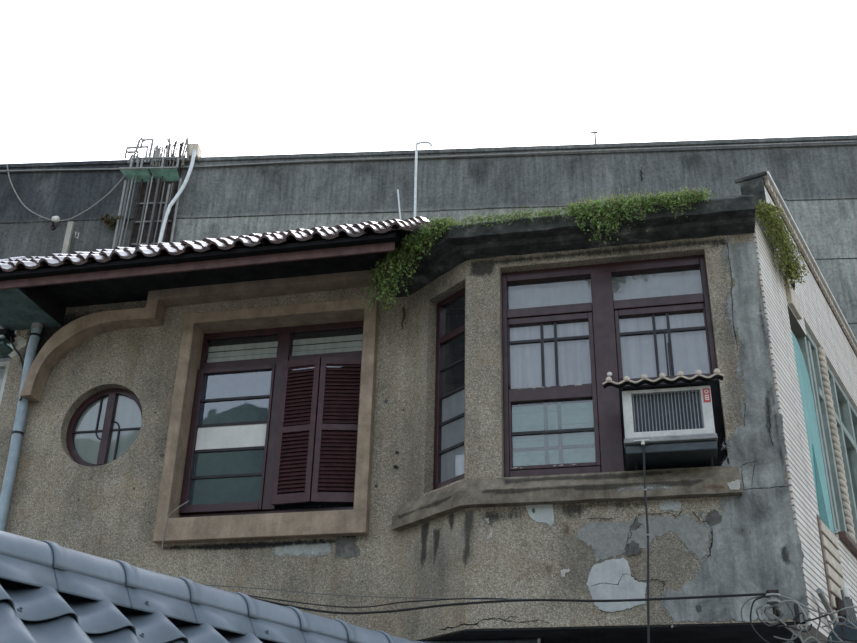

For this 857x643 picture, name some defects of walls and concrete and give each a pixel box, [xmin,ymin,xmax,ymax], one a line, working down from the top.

crack [727,244,738,349]
peeling [573,235,808,628]
crack [741,461,787,490]
water stain [421,523,439,565]
water stain [449,510,473,565]